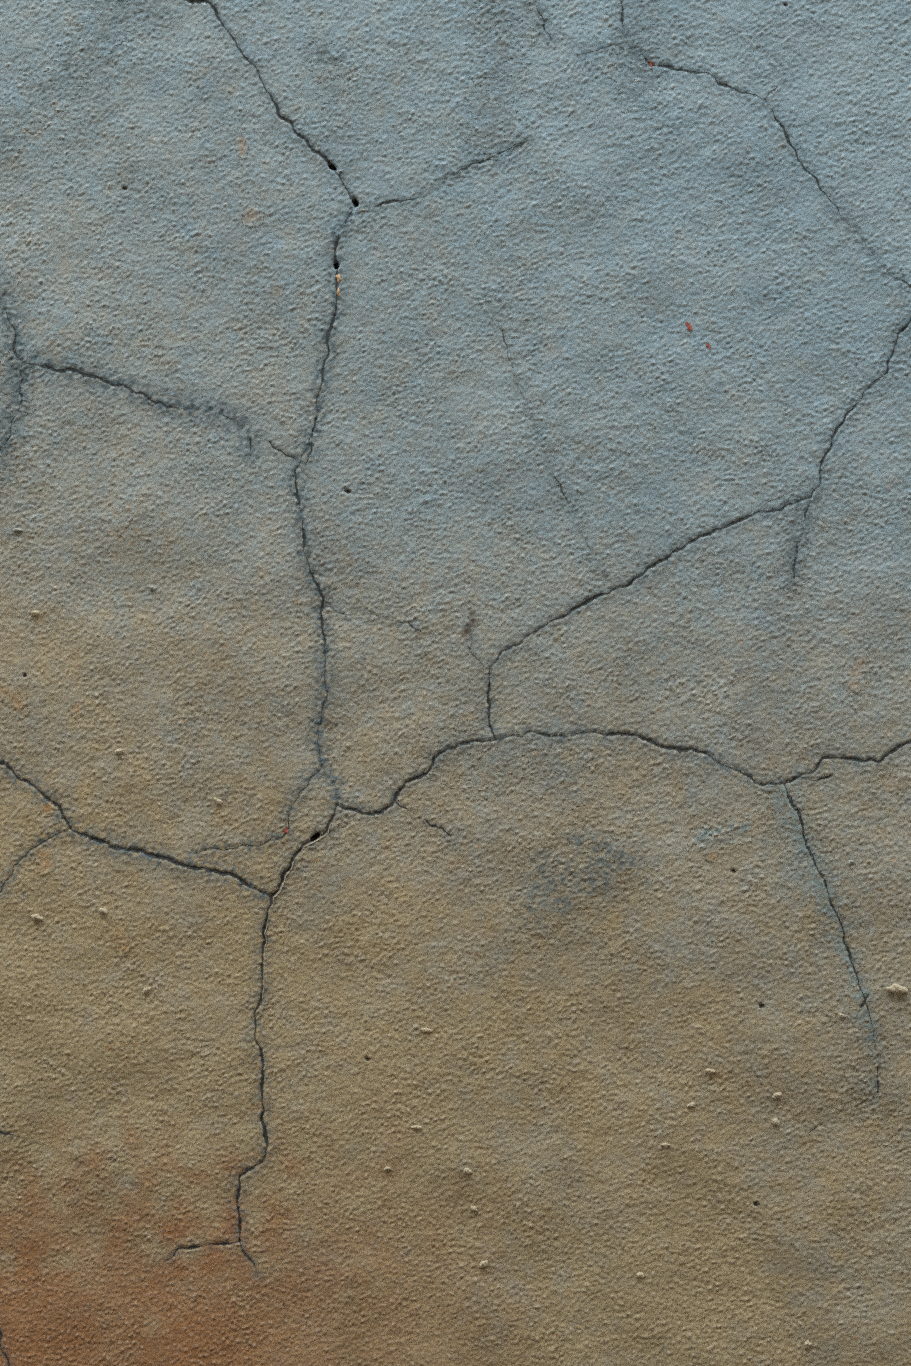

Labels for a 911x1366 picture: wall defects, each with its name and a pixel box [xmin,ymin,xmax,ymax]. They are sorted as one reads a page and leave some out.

crack [374,185,433,207]
crack [458,141,526,171]
crack [537,0,840,214]
crack [187,0,360,853]
crack [0,307,911,1277]